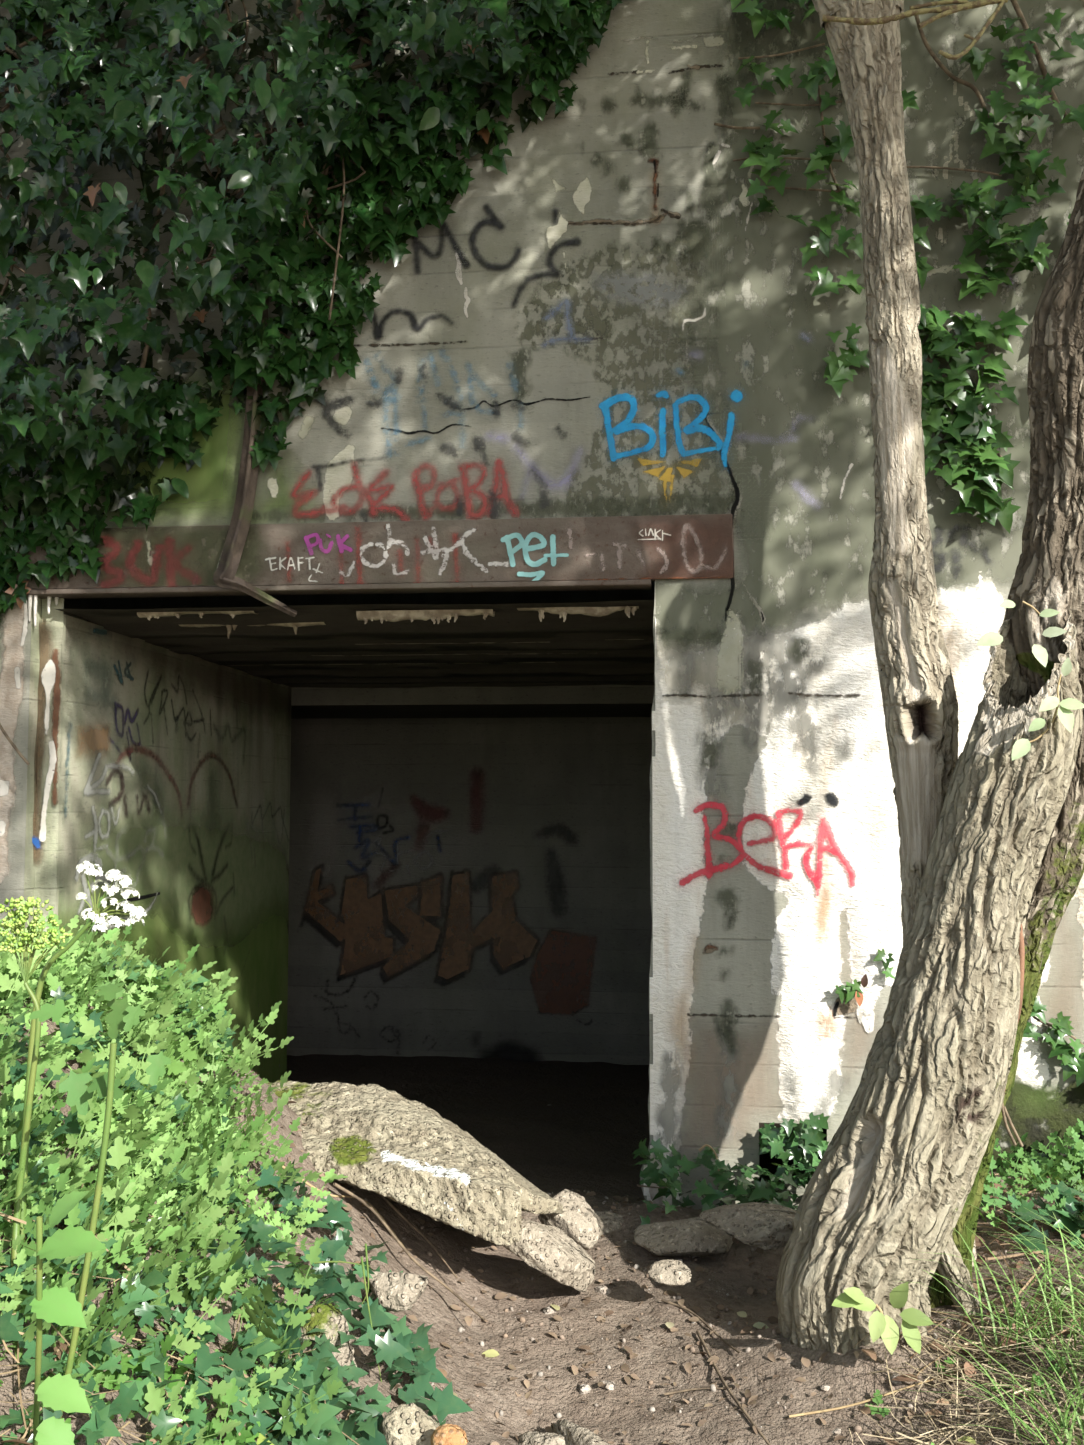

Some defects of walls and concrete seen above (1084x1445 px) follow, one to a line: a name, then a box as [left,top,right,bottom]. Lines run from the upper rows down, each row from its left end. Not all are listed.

corrosion [648,158,659,210]
crack [381,397,590,434]
damp [900,0,1084,757]
damp [345,0,903,1207]
peeling [0,600,28,884]
peeling [32,659,57,848]
spalling [833,997,875,1033]